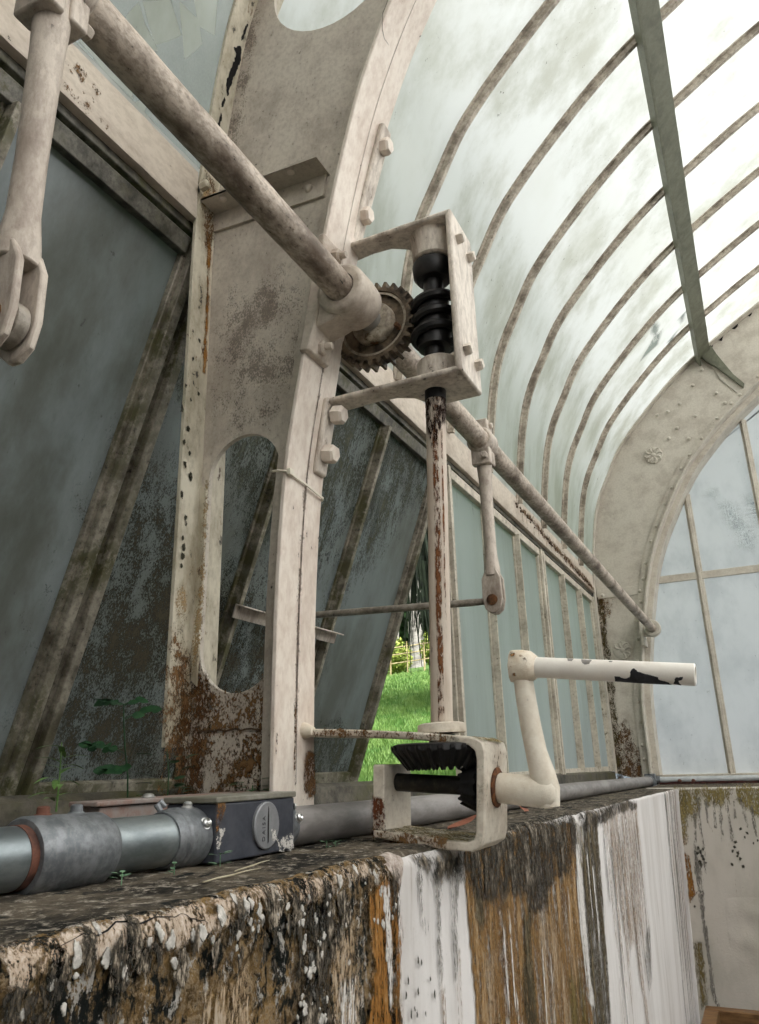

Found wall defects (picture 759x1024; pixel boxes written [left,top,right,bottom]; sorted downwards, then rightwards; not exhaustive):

rust [202,171,215,373]
rust [155,480,264,796]
rust [597,598,613,660]
rust [607,682,653,779]
water stain [2,914,163,1024]
water stain [173,895,246,989]
water stain [259,876,352,1024]
water stain [411,799,637,1024]
water stain [634,906,652,1024]
water stain [664,789,759,1022]